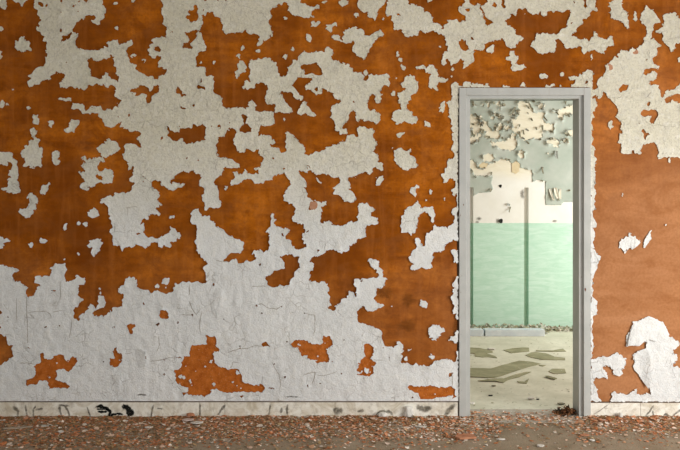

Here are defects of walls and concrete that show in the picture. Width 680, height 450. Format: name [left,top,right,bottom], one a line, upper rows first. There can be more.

crack [16,286,72,343]
peeling [0,0,460,401]
peeling [354,0,614,271]
peeling [560,0,680,403]